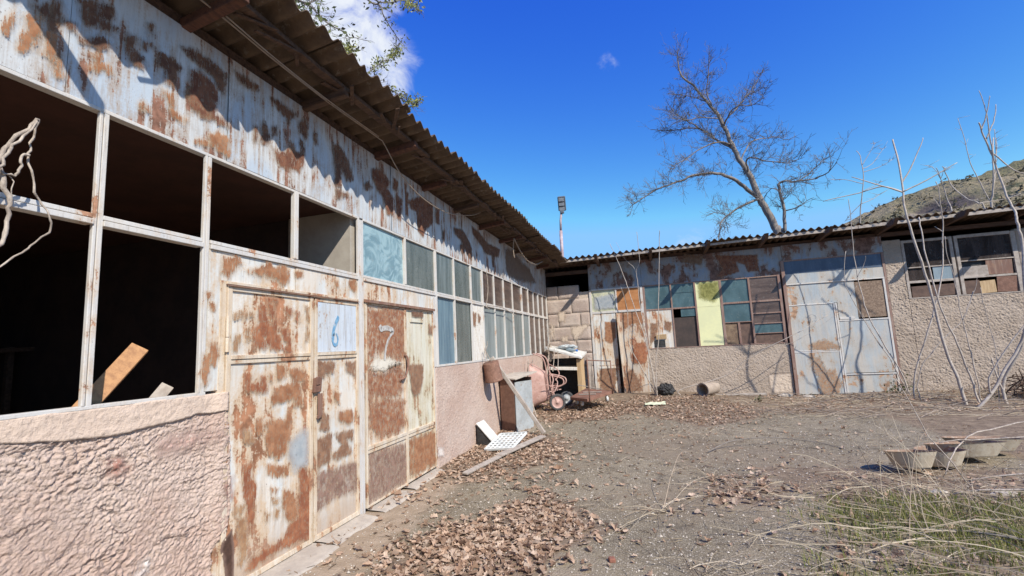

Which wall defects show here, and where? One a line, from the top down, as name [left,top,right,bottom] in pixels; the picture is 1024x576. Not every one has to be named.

rust [1,0,260,158]
rust [255,97,318,172]
rust [333,142,536,284]
rust [715,255,759,278]
rust [200,341,220,386]
rust [599,311,672,393]
rust [233,295,438,570]